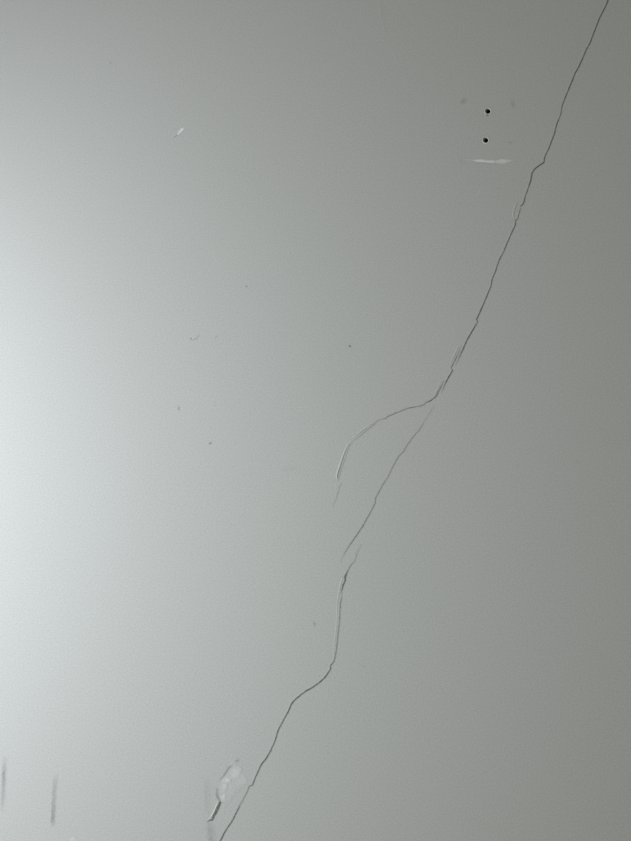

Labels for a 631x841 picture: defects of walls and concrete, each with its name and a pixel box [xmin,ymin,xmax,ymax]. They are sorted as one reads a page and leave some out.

crack [220,0,609,841]